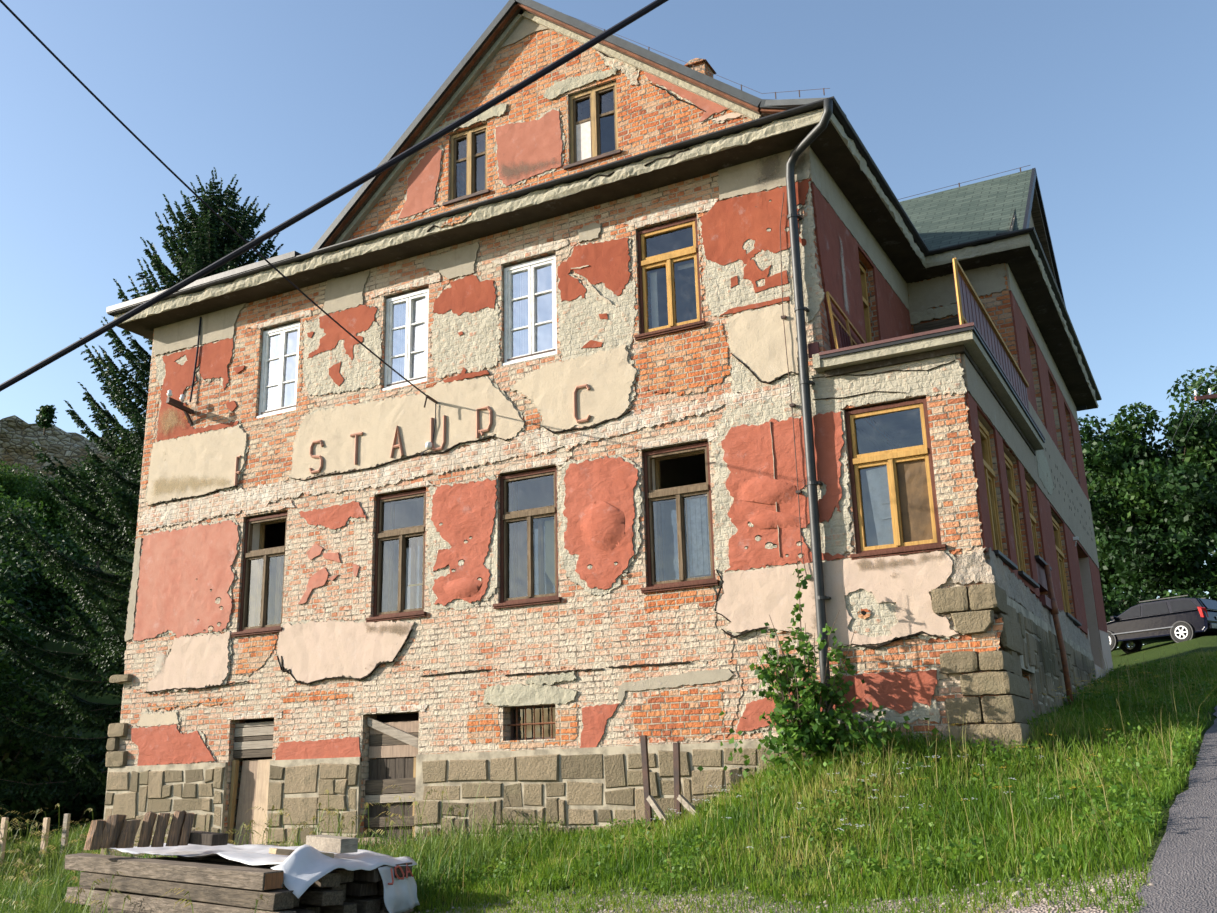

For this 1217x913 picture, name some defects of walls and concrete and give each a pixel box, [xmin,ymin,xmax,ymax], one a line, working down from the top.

flaking render [350,29,765,240]
flaking render [123,178,1092,765]